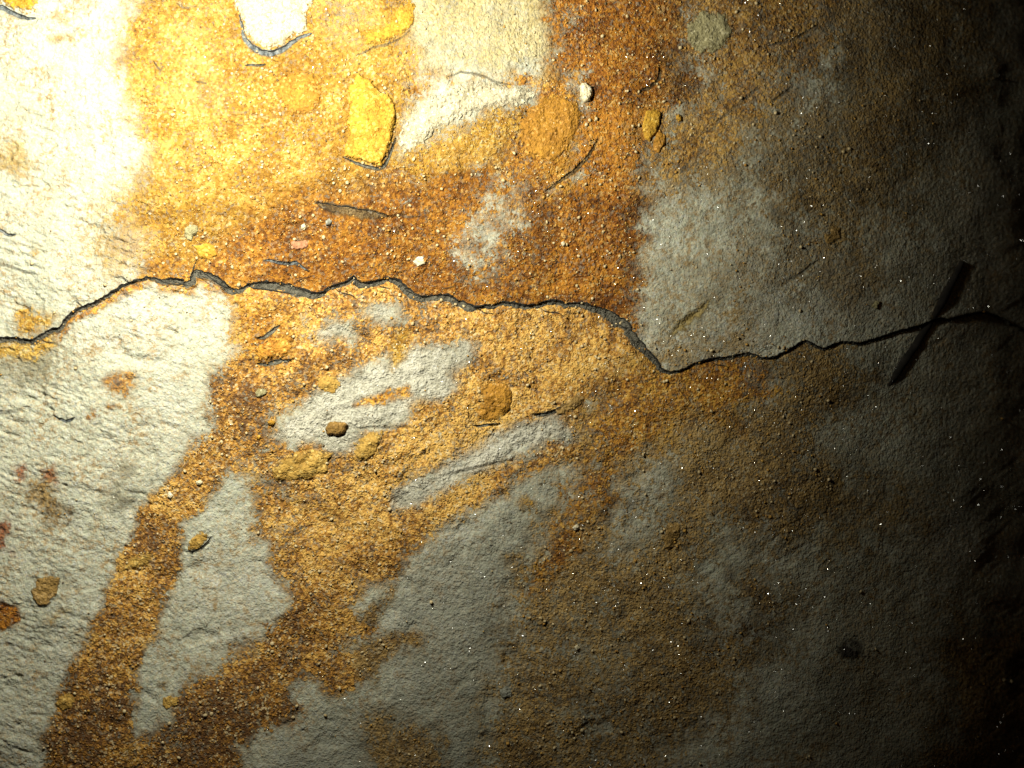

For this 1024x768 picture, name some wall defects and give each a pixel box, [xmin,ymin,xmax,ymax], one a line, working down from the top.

crack [0,259,1024,383]
corrosion [103,371,135,409]
corrosion [356,385,410,407]
peeling [468,58,1024,768]
corrosion [16,466,73,526]
corrosion [728,563,800,636]
corrosion [360,709,452,768]